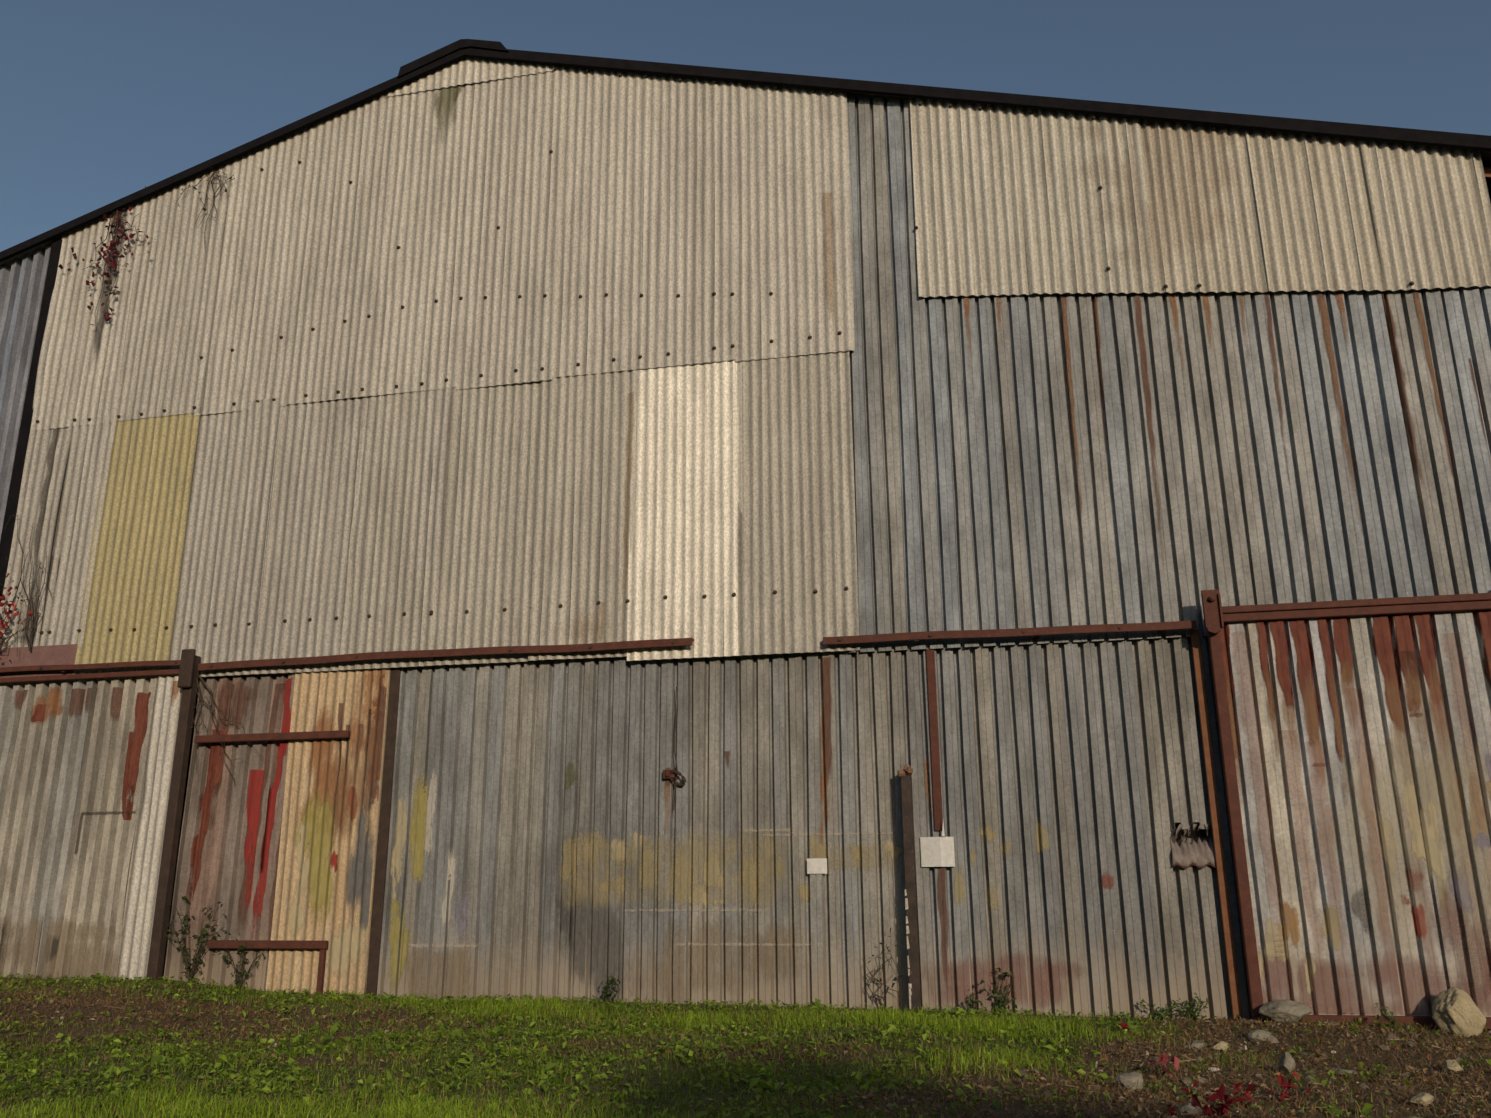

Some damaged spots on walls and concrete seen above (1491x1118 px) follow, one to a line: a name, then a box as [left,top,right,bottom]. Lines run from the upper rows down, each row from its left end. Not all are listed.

corrosion [1061,295,1081,510]
corrosion [1093,294,1103,400]
corrosion [1316,292,1352,459]
corrosion [1381,292,1420,472]
corrosion [15,687,151,820]
corrosion [186,683,254,900]
corrosion [301,668,387,826]
corrosion [820,657,832,834]
corrosion [1220,623,1239,759]
corrosion [1256,617,1353,767]
corrosion [1372,613,1442,736]
corrosion [1474,610,1491,689]